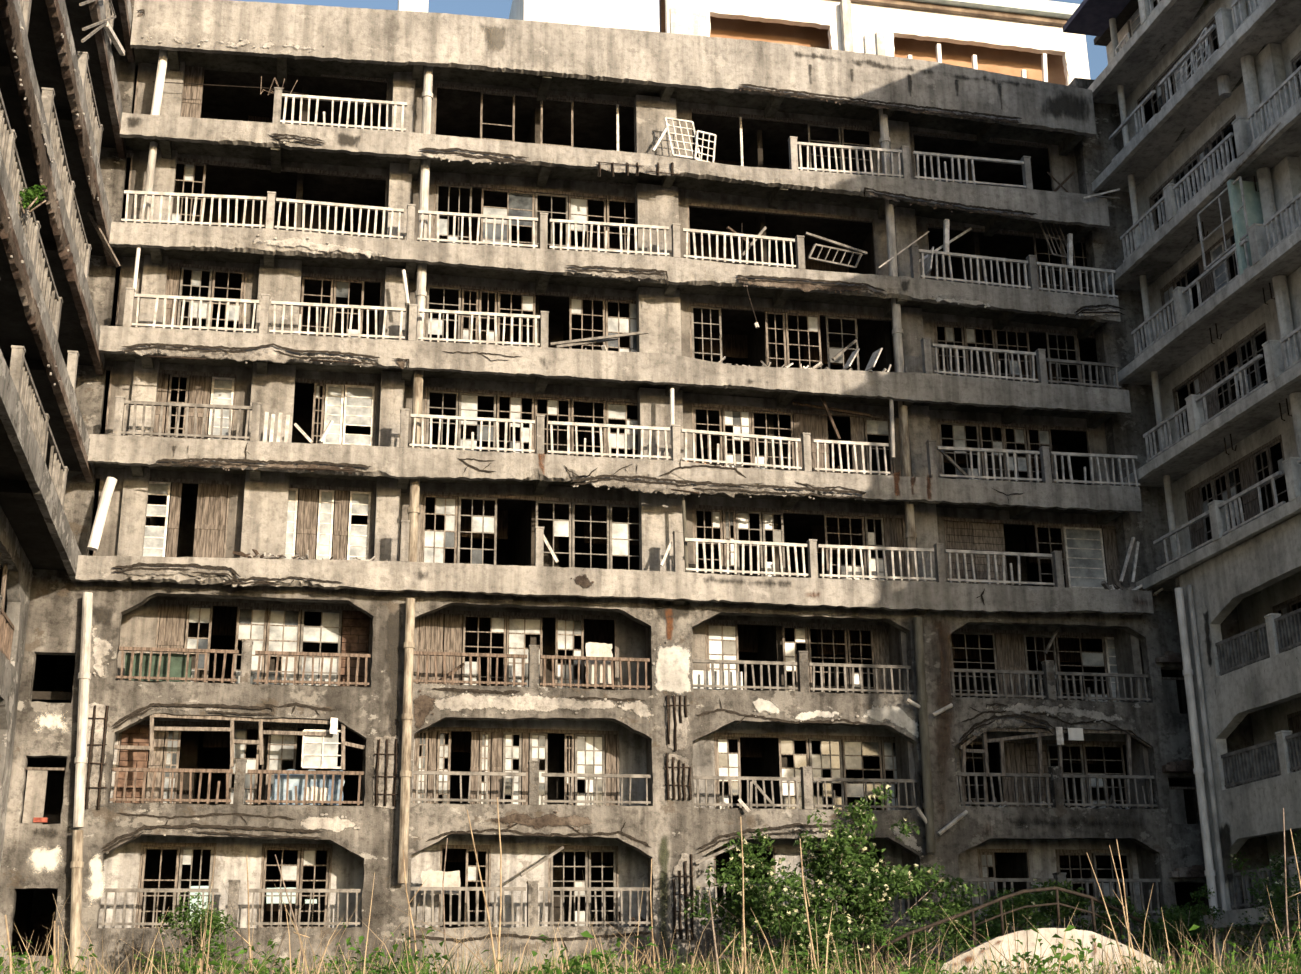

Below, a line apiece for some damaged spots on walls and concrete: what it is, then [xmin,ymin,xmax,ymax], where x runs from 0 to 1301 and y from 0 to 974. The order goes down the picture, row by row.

rust [894,472,932,499]
peeling [412,641,692,800]
peeling [753,698,919,738]